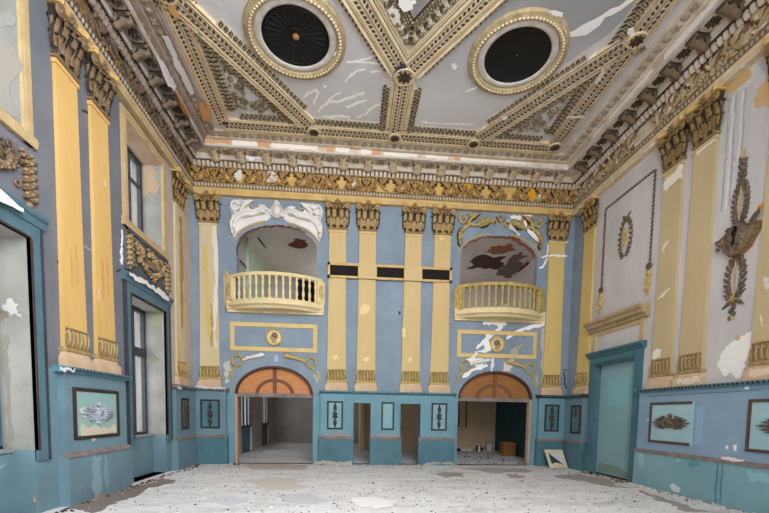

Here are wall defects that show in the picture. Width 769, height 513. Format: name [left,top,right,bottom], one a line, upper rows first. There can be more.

peeling [696,67,769,212]
spalling [236,224,308,255]
spalling [463,219,535,278]
flaking render [503,348,519,372]
spalling [717,331,769,390]